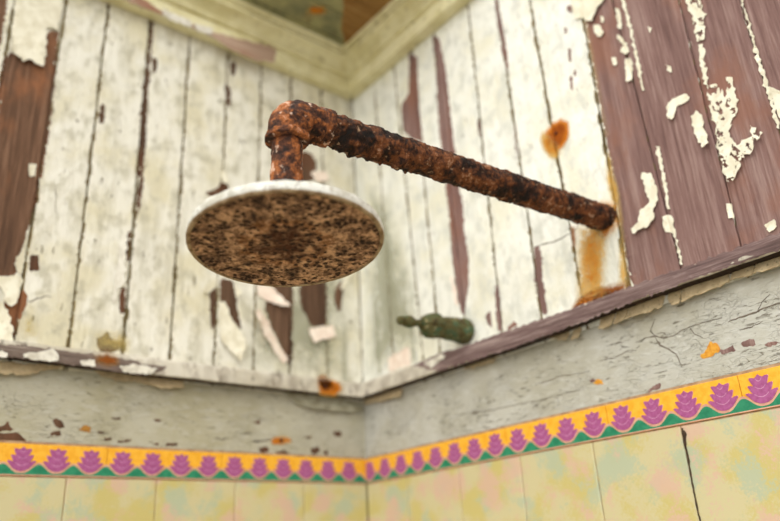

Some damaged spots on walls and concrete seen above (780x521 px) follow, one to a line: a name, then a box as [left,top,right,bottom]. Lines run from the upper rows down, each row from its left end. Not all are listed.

corrosion [541,119,569,158]
peeling [0,0,185,389]
peeling [388,0,780,372]
corrosion [571,157,627,308]
peeling [204,278,247,361]
peeling [255,274,352,365]
corrosion [317,375,341,395]
crack [455,294,780,416]
crack [681,428,701,521]